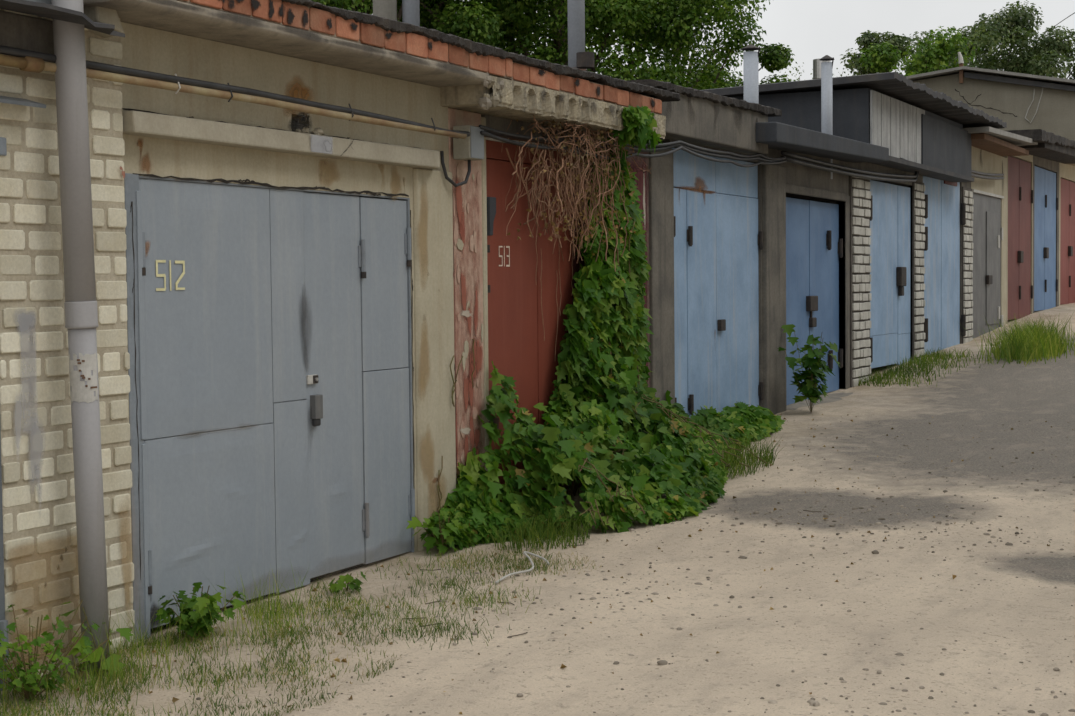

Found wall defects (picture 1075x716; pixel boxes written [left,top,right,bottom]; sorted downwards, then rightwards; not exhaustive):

spalling [478,75,504,110]
peeling [453,163,483,478]